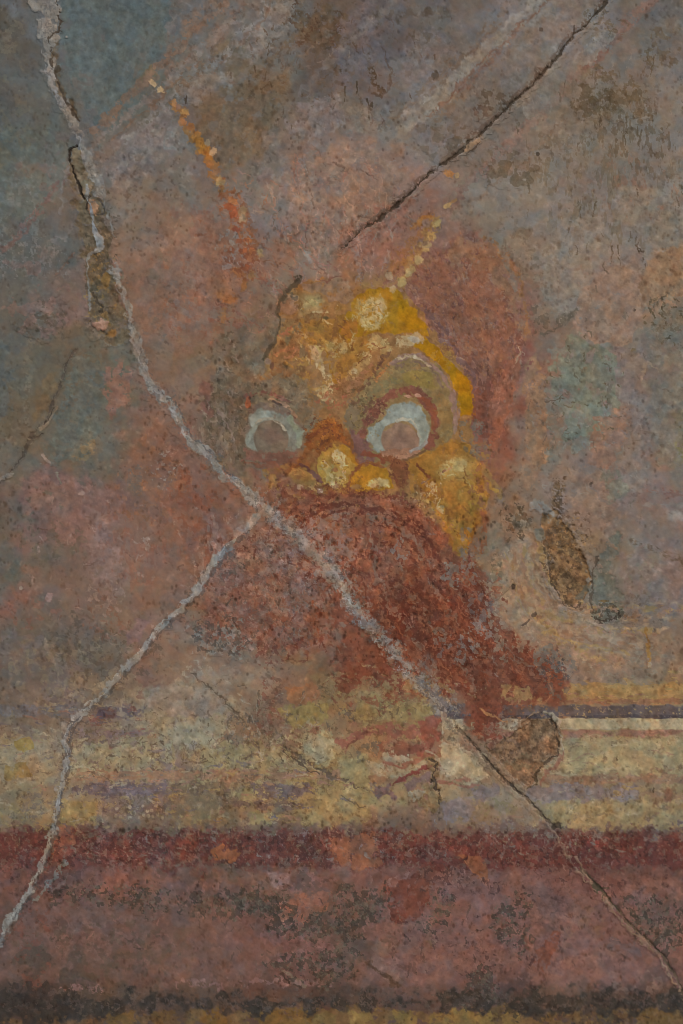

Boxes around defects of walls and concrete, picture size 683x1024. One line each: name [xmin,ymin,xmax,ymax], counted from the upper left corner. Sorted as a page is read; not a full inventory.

crack [334,0,614,256]
crack [0,346,79,482]
crack [491,579,538,628]
flaking render [499,476,649,633]
crack [0,508,267,949]
crack [271,736,371,810]
flaking render [484,710,569,792]